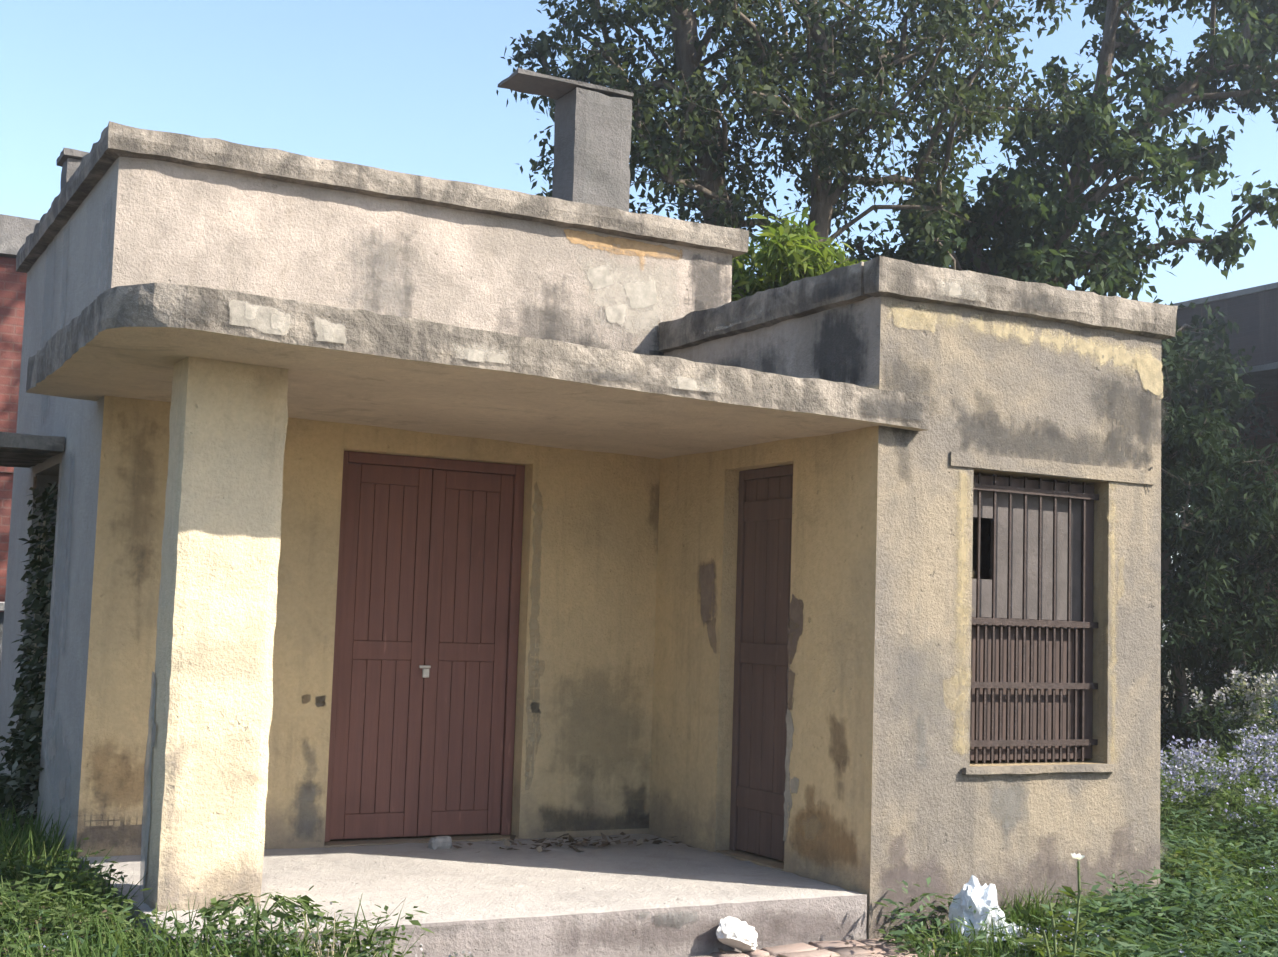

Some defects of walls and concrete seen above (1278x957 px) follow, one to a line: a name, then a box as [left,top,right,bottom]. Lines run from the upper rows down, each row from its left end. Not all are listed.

water stain [692,256,729,310]
water stain [315,317,346,344]
water stain [814,314,864,384]
water stain [864,398,921,421]
water stain [962,416,1151,468]
spalling [699,561,715,624]
spalling [783,594,804,841]
water stain [295,785,316,836]